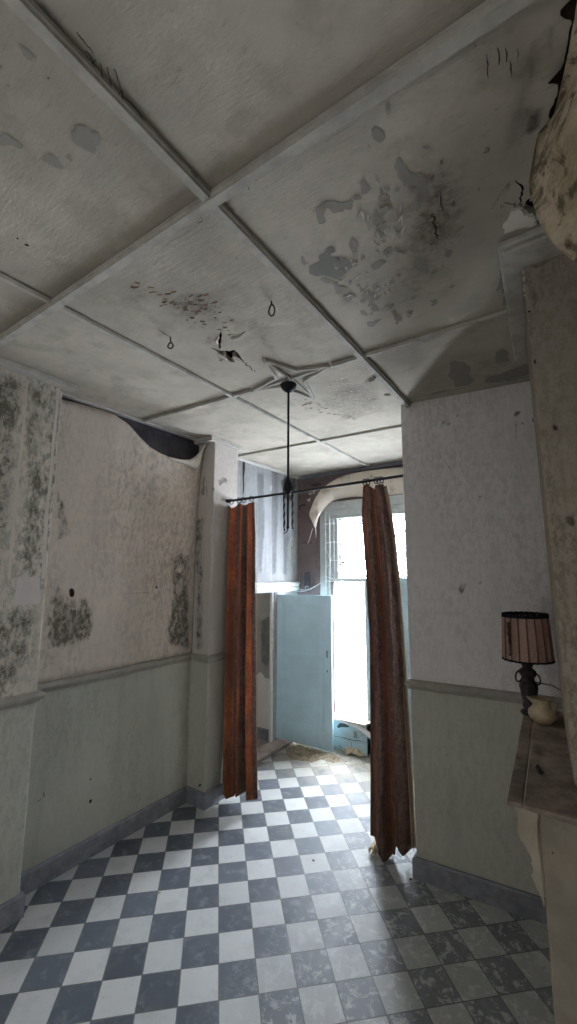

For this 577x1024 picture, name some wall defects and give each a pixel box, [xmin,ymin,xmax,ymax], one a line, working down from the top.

peeling [301,157,438,327]
mould [0,376,20,489]
mould [0,611,29,686]
mould [48,590,91,646]
mould [168,520,202,646]